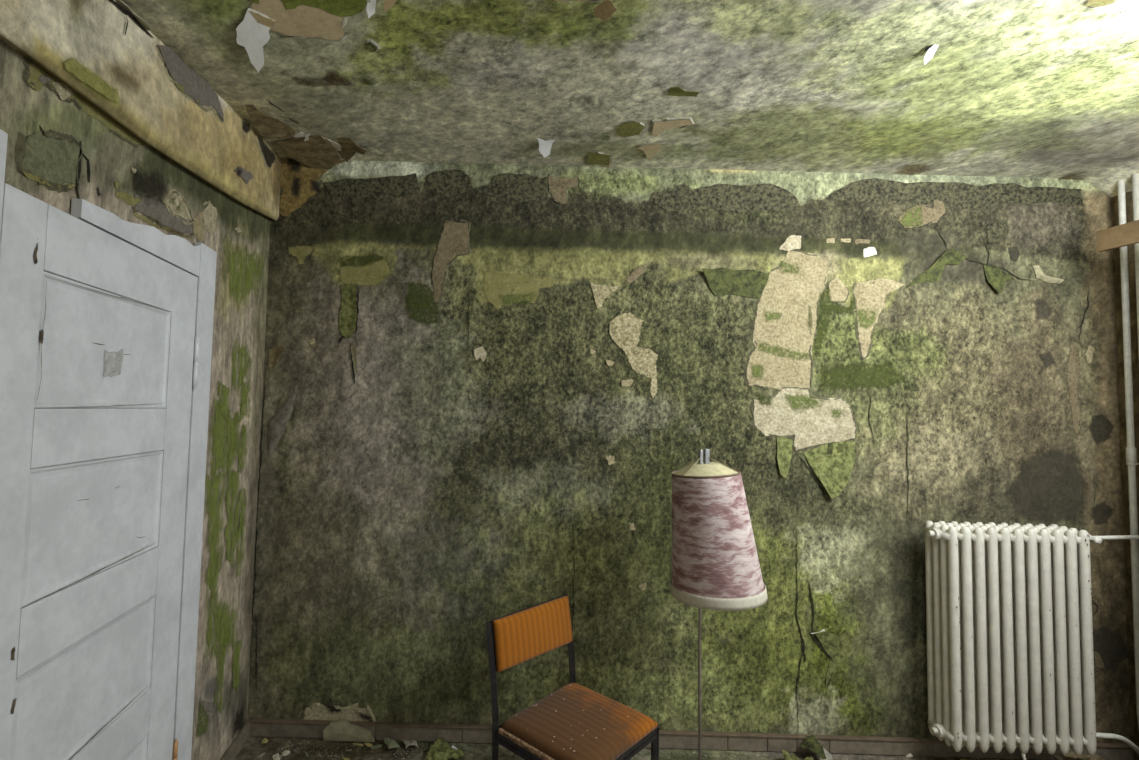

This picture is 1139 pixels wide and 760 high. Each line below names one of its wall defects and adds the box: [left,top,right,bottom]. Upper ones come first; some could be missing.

spalling [155,44,224,124]
peeling [236,0,397,73]
damp [295,61,374,86]
spalling [241,105,367,217]
damp [902,165,927,175]
flaking render [430,219,472,304]
damp [1035,298,1051,319]
flaking render [609,312,658,398]
flaking render [702,235,967,499]
damp [1090,414,1114,444]
damp [1009,448,1113,524]
damp [1093,627,1129,670]